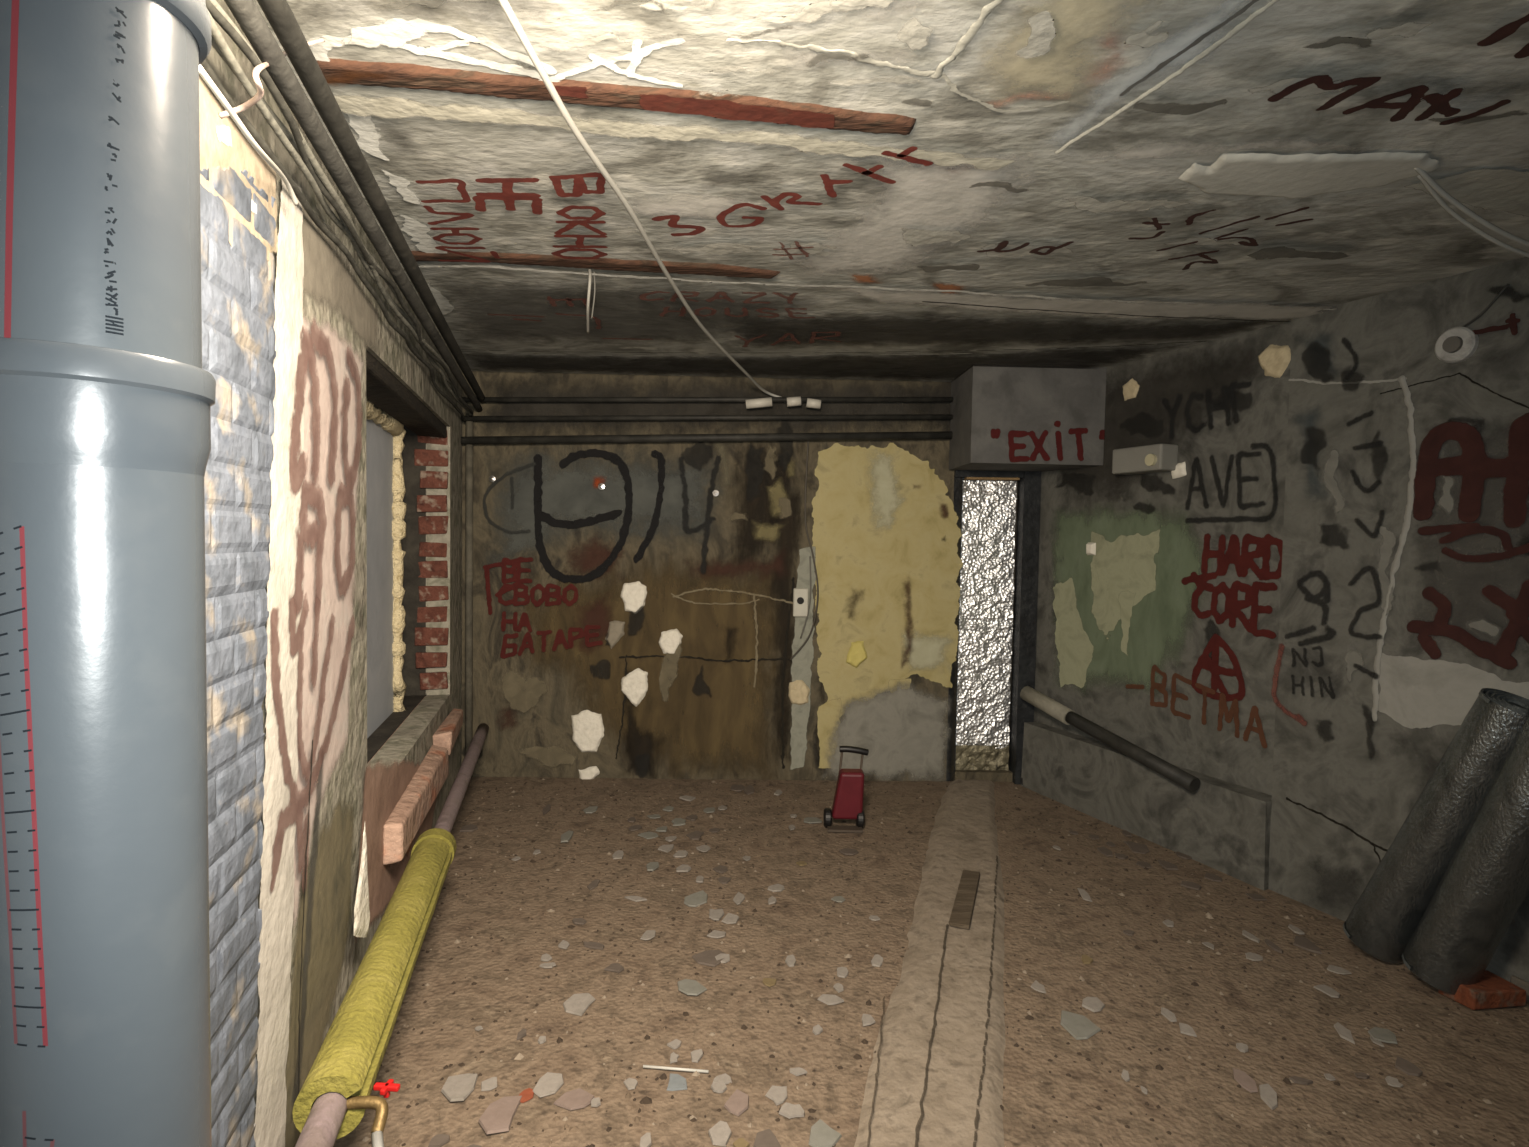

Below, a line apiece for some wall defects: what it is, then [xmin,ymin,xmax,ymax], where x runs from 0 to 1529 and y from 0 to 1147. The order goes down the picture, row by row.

peeling [493,455,713,561]
peeling [730,446,793,540]
peeling [790,443,963,781]
peeling [1053,508,1201,689]
peeling [502,671,547,713]
peeling [659,644,682,701]